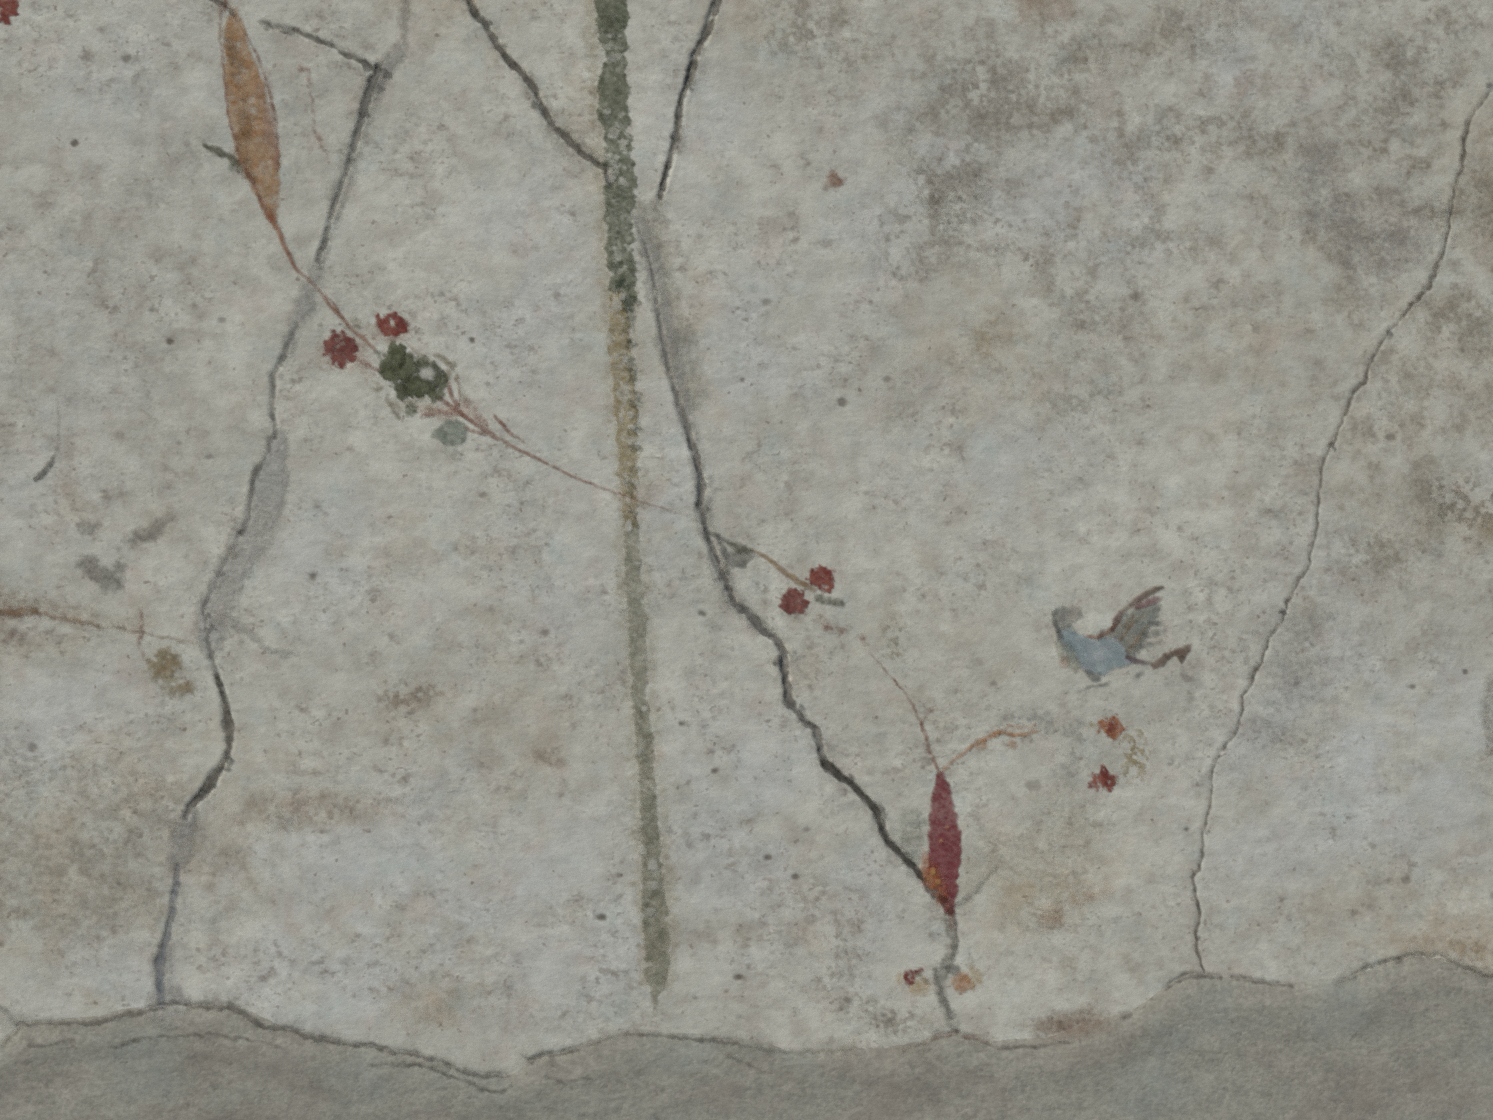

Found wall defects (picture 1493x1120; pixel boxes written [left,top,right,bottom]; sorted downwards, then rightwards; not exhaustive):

crack [25,0,578,1091]
crack [467,0,613,183]
crack [636,0,944,905]
crack [1167,82,1491,987]
crack [682,1036,738,1044]